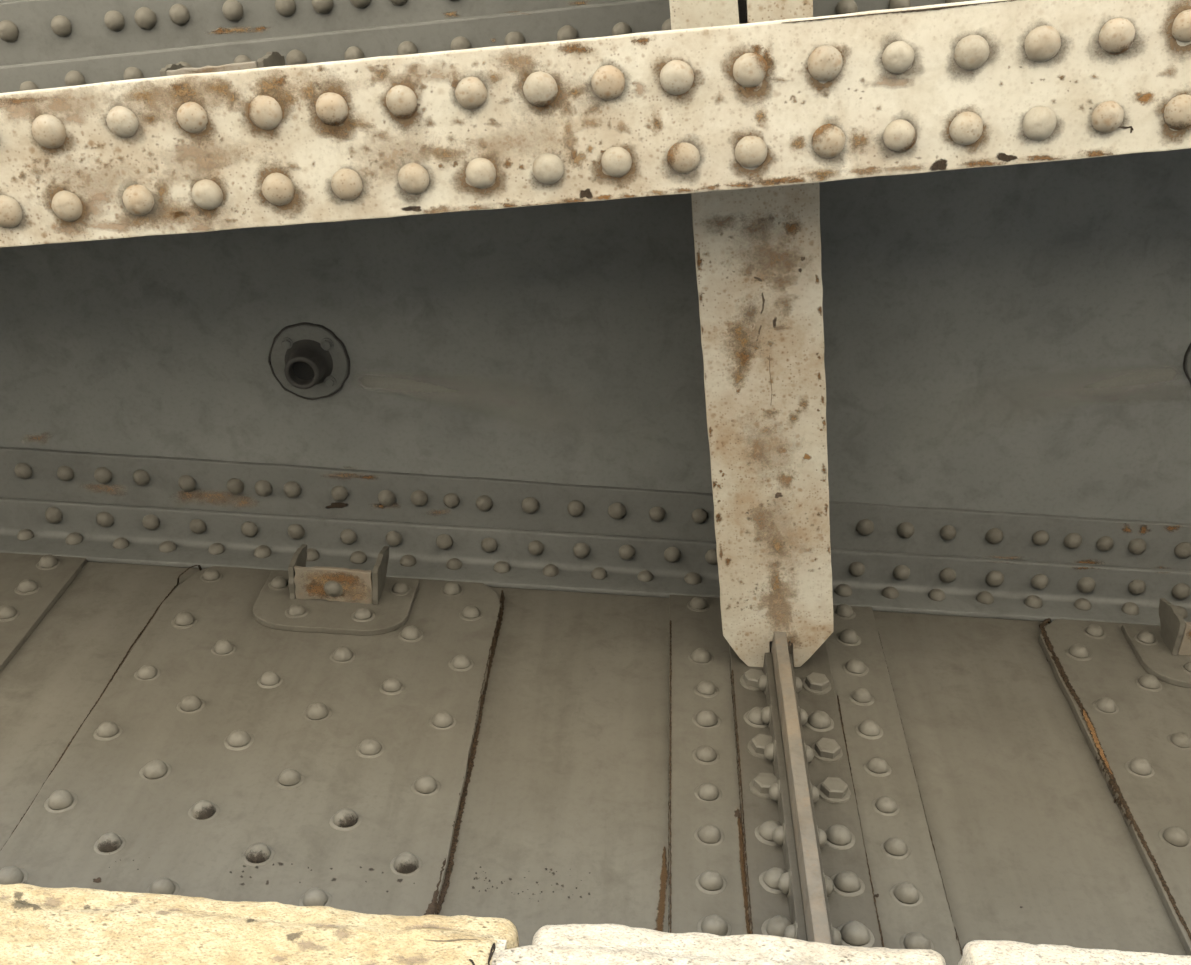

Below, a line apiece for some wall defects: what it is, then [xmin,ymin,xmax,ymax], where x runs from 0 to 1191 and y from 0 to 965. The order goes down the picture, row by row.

corrosion [563,44,592,53]
corrosion [654,60,702,101]
corrosion [723,45,785,102]
corrosion [785,47,847,104]
corrosion [1165,0,1191,55]
corrosion [0,63,538,234]
corrosion [505,56,661,203]
corrosion [652,113,834,195]
corrosion [854,109,1057,175]
corrosion [1136,91,1191,142]
corrosion [654,620,672,933]
corrosion [1039,618,1191,940]